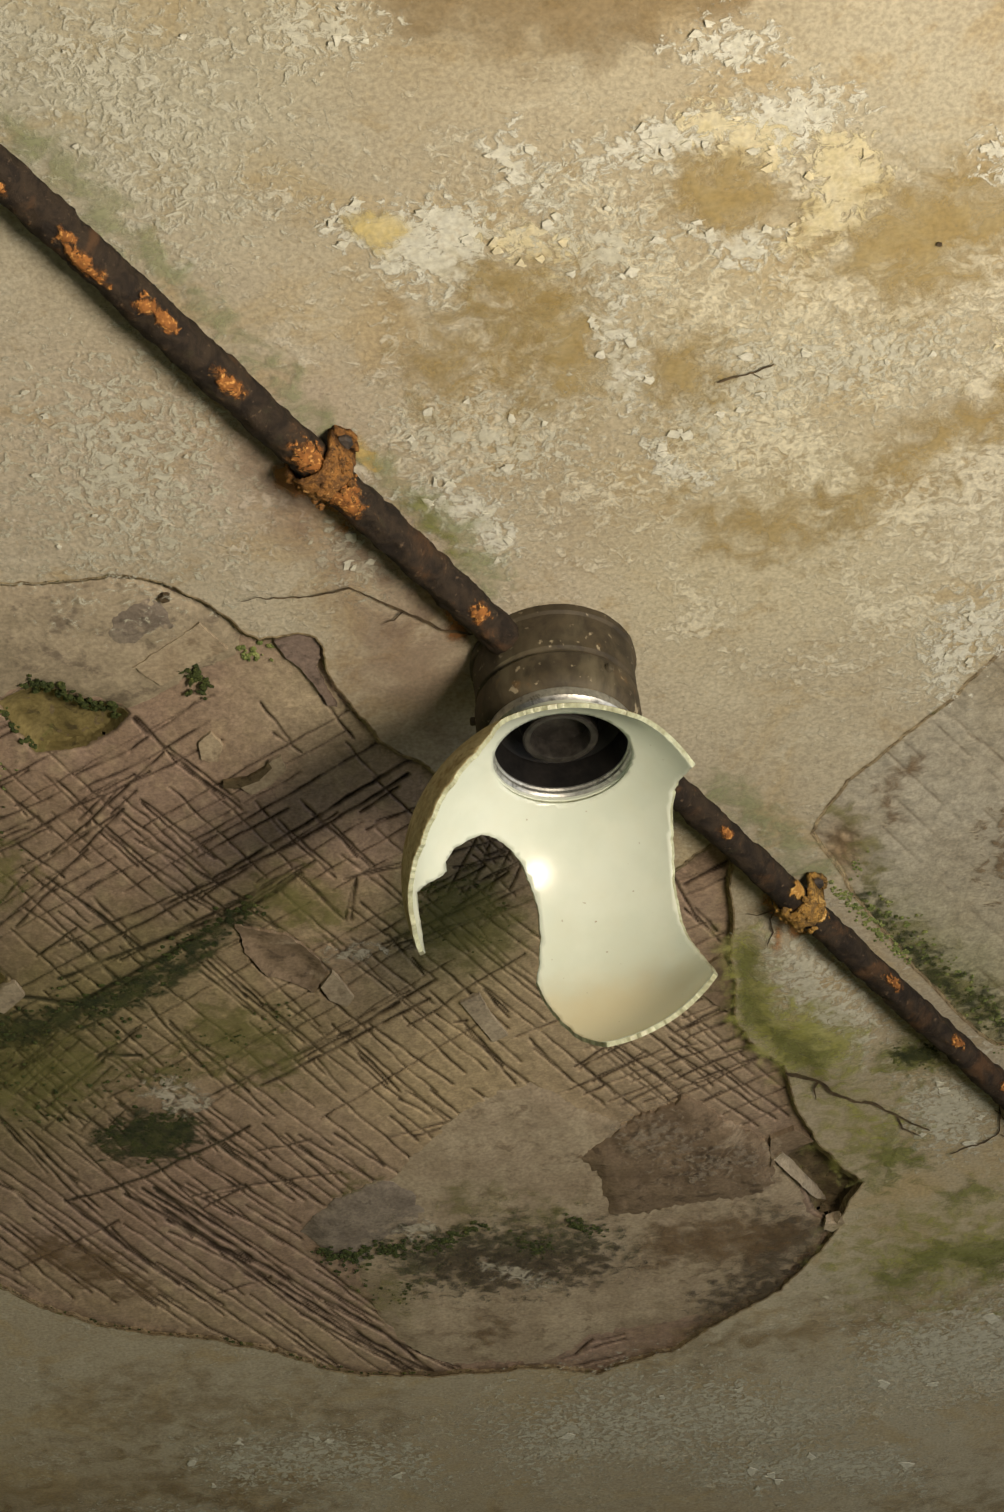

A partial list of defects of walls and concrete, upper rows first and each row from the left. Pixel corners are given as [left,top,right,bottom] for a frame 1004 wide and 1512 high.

damp [677,152,776,236]
rust [53,226,113,290]
damp [835,173,1004,300]
rust [132,291,181,335]
damp [468,260,592,395]
rust [216,367,247,399]
rust [274,436,382,533]
damp [818,381,1004,524]
crack [241,587,474,635]
flaking render [0,305,1004,1512]
rust [762,880,830,948]
crack [785,1073,1004,1154]